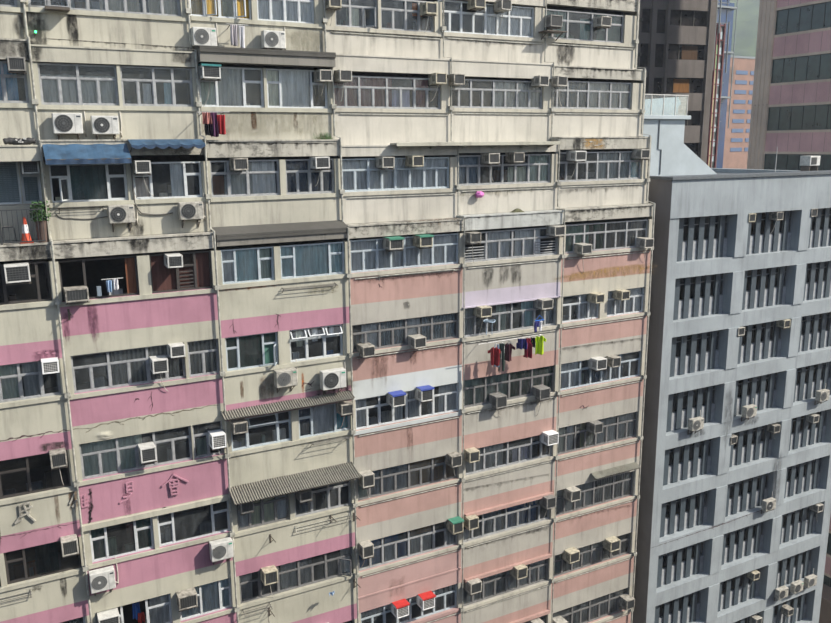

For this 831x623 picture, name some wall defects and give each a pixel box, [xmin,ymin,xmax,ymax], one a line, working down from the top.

leakage [15,6,126,59]
rust [566,265,648,279]
crack [2,392,211,442]
crack [0,489,93,539]